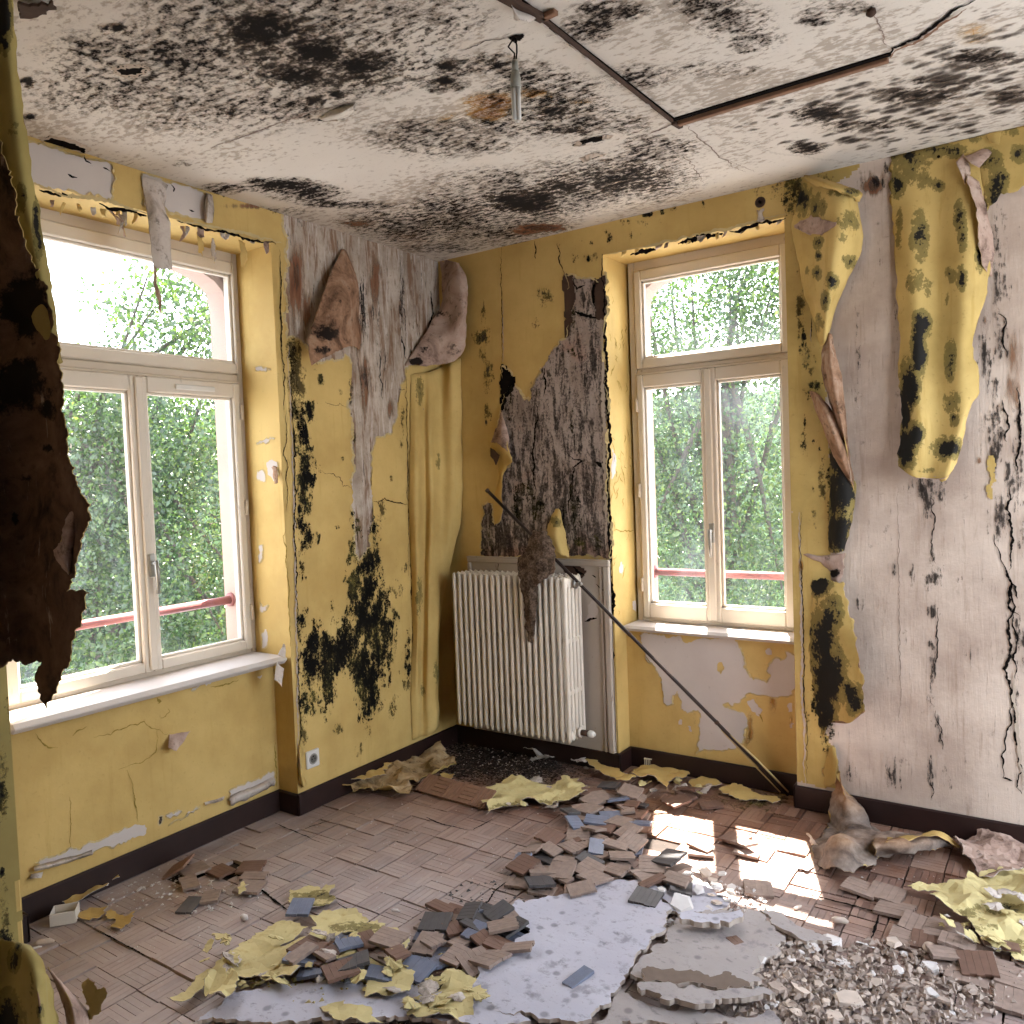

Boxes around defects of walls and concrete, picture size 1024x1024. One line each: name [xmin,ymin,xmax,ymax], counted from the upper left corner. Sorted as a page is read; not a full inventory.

flaking render [28,140,146,237]
crack [211,103,344,149]
damp [20,0,781,253]
crack [458,0,975,183]
damp [735,17,1024,196]
damp [285,338,324,581]
flaking render [281,214,440,561]
flaking render [479,271,614,560]
crack [35,698,170,820]
damp [296,501,411,755]
peeling [639,632,795,754]
crack [994,488,1024,793]